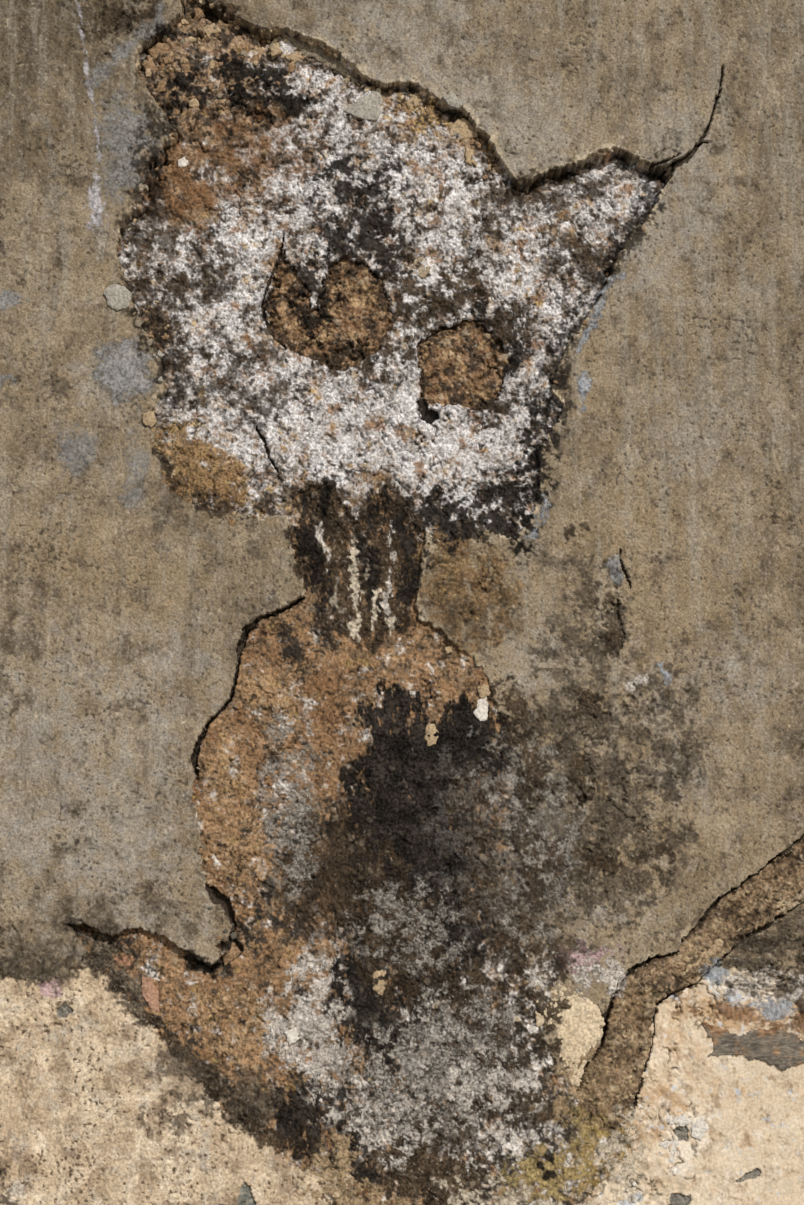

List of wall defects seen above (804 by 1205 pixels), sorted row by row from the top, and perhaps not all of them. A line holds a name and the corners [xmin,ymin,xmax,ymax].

spalling [103,0,668,565]
crack [648,68,723,183]
crack [205,883,243,969]
crack [191,596,305,777]
damp [0,523,709,1205]
spalling [0,522,804,1205]